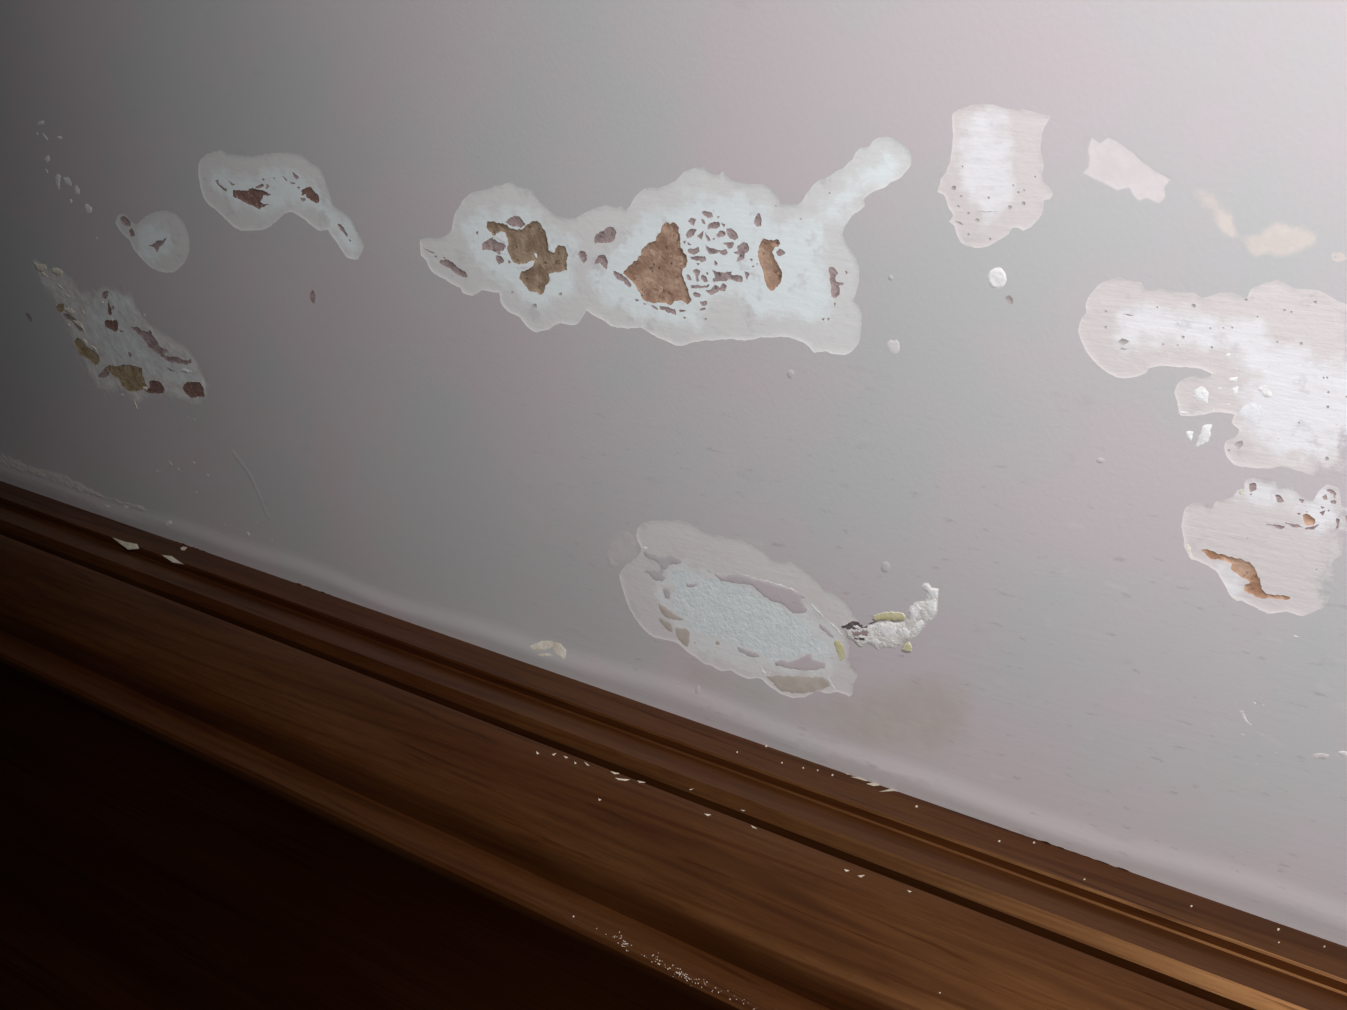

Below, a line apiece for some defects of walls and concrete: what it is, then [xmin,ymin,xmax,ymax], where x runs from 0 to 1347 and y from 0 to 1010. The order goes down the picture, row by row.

peeling [115,211,190,273]
peeling [198,150,364,260]
peeling [420,137,911,355]
peeling [938,104,1053,248]
peeling [1082,136,1172,204]
spalling [30,254,211,410]
peeling [1078,277,1347,616]
peeling [619,520,939,698]